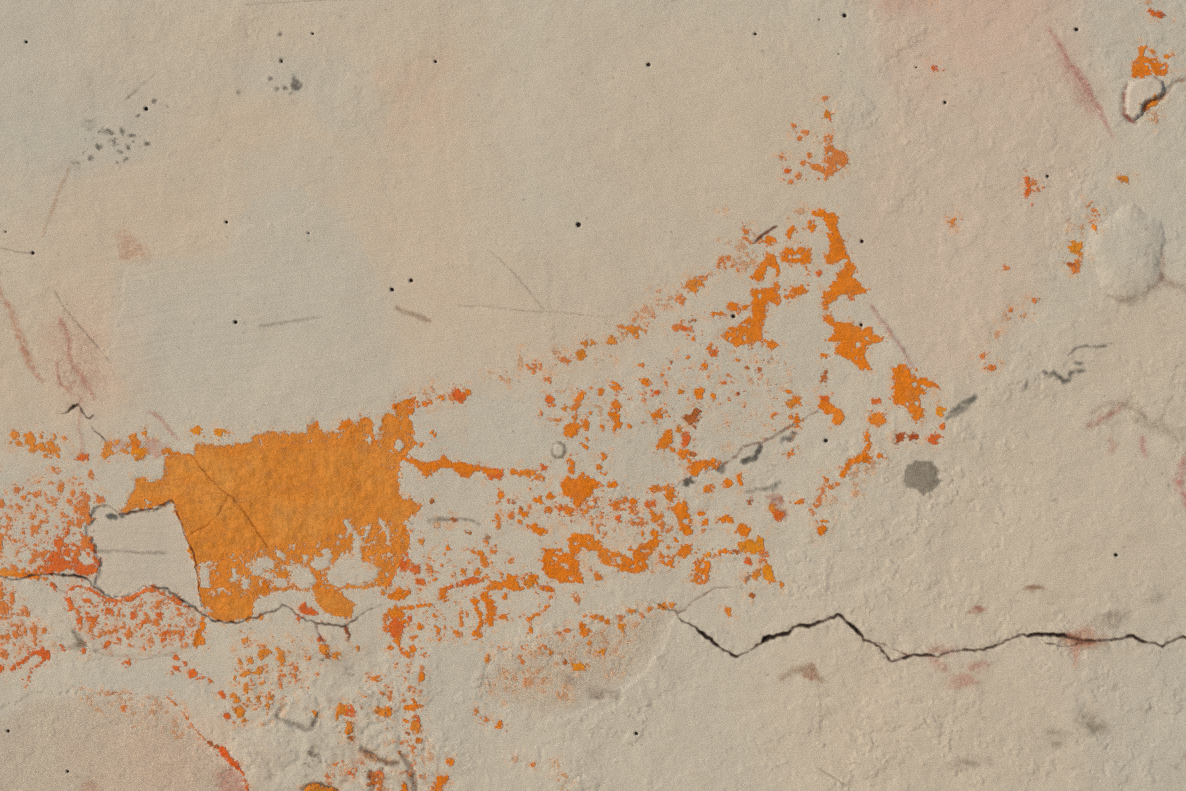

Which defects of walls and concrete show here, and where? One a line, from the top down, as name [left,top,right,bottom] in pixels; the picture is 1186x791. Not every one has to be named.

peeling [1124,45,1174,125]
peeling [778,96,850,185]
peeling [746,364,946,536]
peeling [0,207,887,791]
crack [0,573,110,597]
crack [119,500,358,642]
crack [665,592,1186,662]